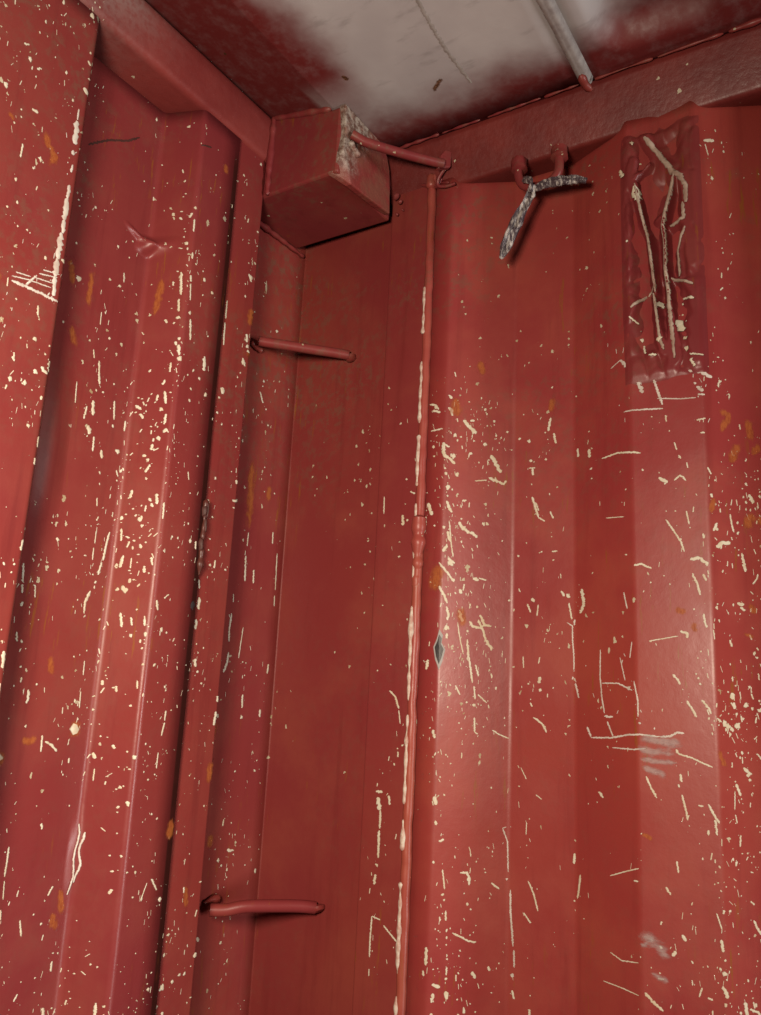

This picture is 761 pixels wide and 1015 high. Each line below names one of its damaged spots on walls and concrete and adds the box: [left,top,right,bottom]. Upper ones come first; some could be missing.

peeling [5,337,50,465]
peeling [56,206,228,694]
peeling [203,300,250,400]
peeling [0,532,47,624]
peeling [423,358,531,758]
peeling [0,628,45,703]
peeling [40,688,159,792]
peeling [666,424,761,1015]
peeling [0,847,24,937]
peeling [33,952,98,1015]
peeling [122,920,201,1015]
peeling [422,847,500,1015]